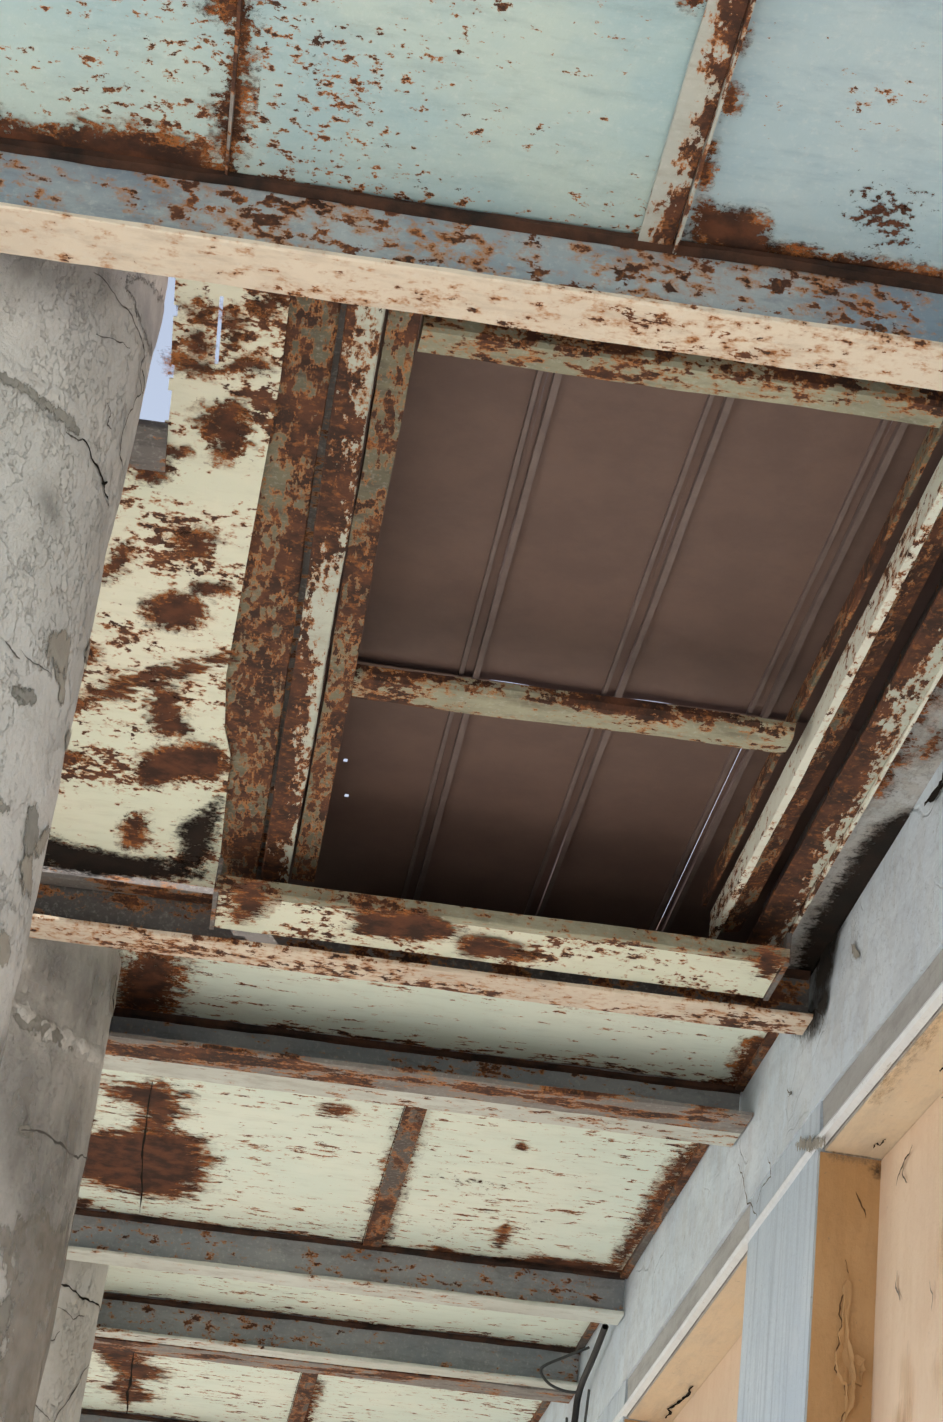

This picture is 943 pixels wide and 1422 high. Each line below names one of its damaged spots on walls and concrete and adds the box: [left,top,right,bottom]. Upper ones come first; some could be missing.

rust [0,0,268,172]
rust [682,141,943,279]
rust [137,580,239,633]
peeling [9,684,37,707]
peeling [45,629,91,708]
rust [75,650,240,868]
crack [924,773,943,806]
peeling [19,803,51,897]
crack [18,1104,87,1159]
rust [76,1074,231,1210]
crack [51,1284,100,1341]
crack [36,1365,89,1422]